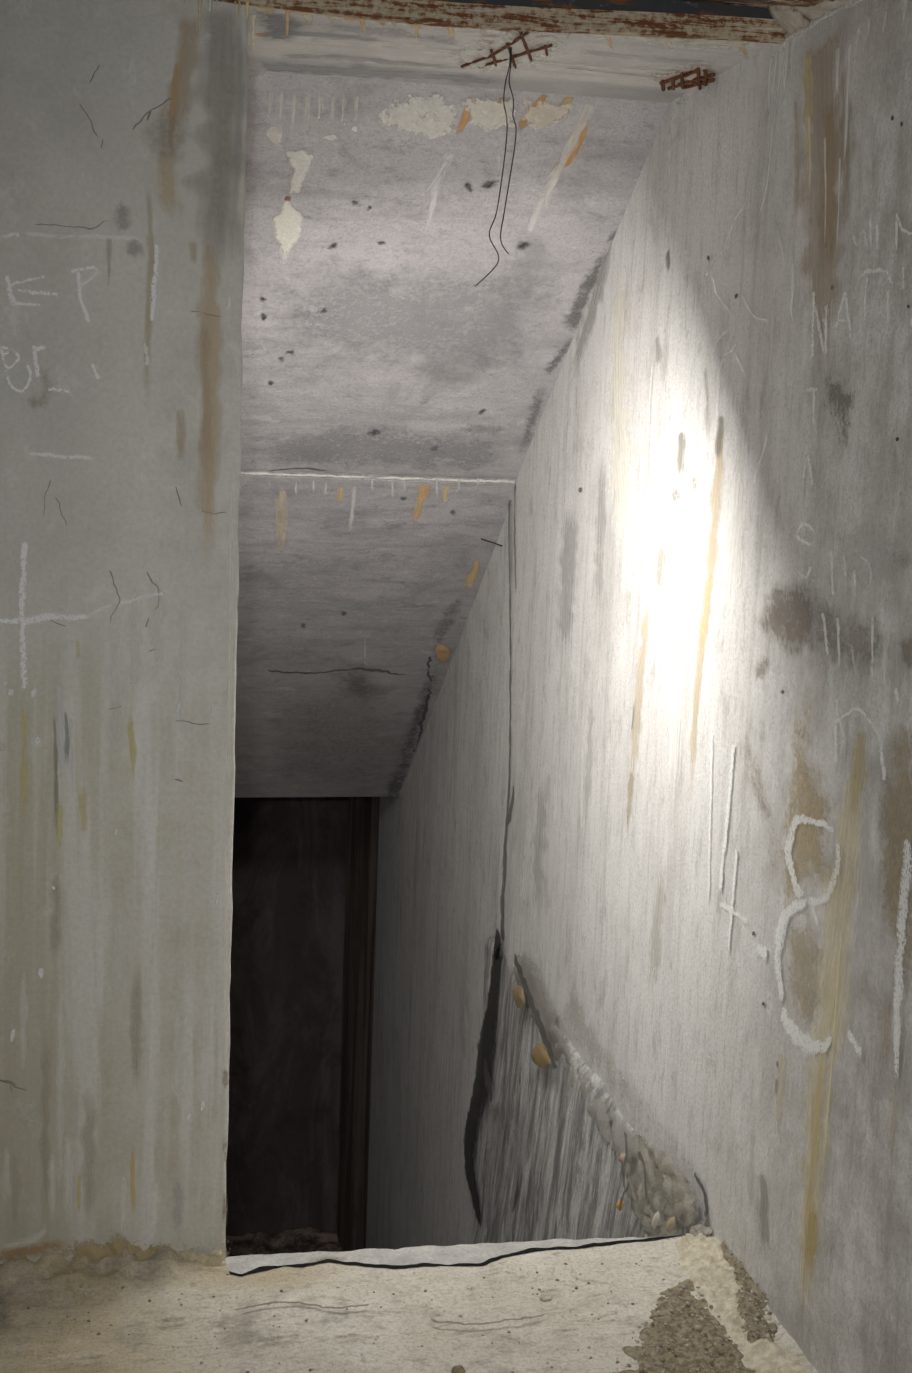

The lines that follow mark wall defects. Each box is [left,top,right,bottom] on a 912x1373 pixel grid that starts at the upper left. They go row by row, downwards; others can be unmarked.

leakage [267,93,358,259]
leakage [255,6,593,224]
rust [201,249,221,521]
rust [692,418,723,751]
crack [464,485,558,1225]
spalling [513,953,709,1237]